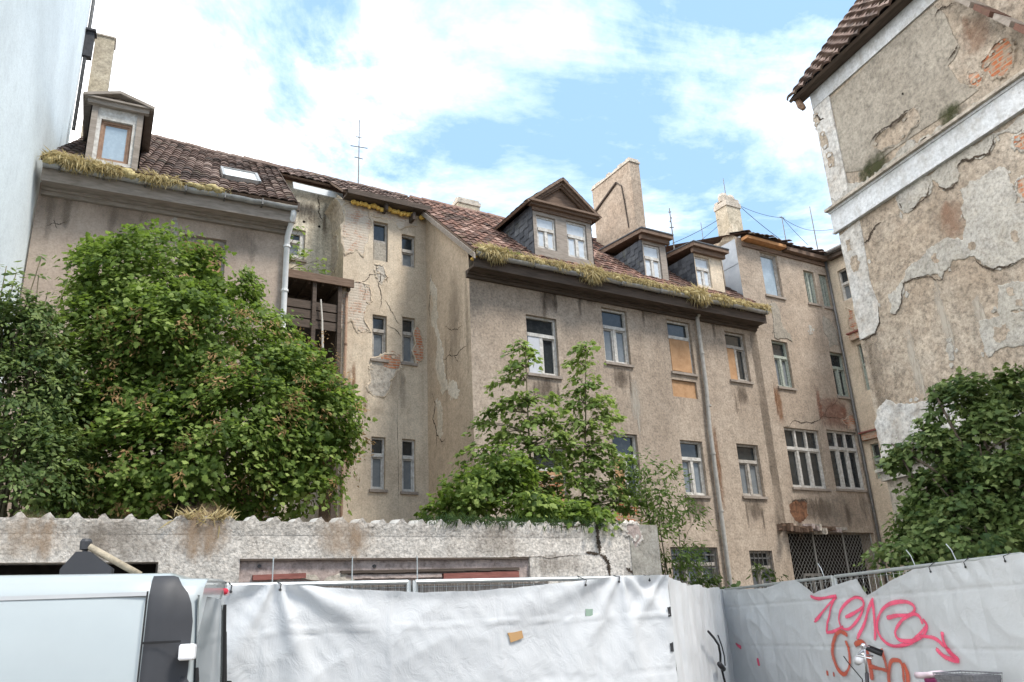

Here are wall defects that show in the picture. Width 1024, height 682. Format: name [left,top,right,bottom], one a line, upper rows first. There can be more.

flaking render [813,6,1019,204]
flaking render [839,114,1024,340]
flaking render [330,200,419,334]
crack [355,269,401,337]
flaking render [365,277,460,439]
flaking render [979,281,1024,358]
peeling [874,385,992,458]
crack [513,524,633,576]
spalling [789,499,808,524]